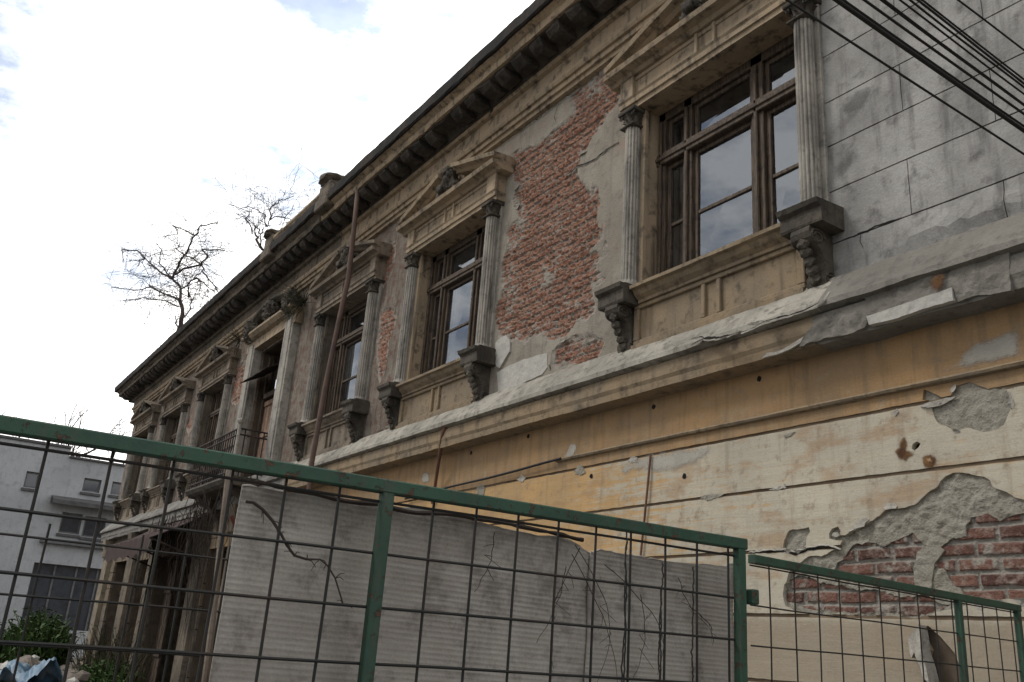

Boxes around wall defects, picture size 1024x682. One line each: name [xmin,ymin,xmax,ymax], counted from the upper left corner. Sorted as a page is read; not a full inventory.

flaking render [494,72,620,370]
flaking render [376,307,397,383]
peeling [960,333,1017,365]
flaking render [920,382,1015,433]
corrosion [895,438,935,468]
flaking render [784,473,1024,618]